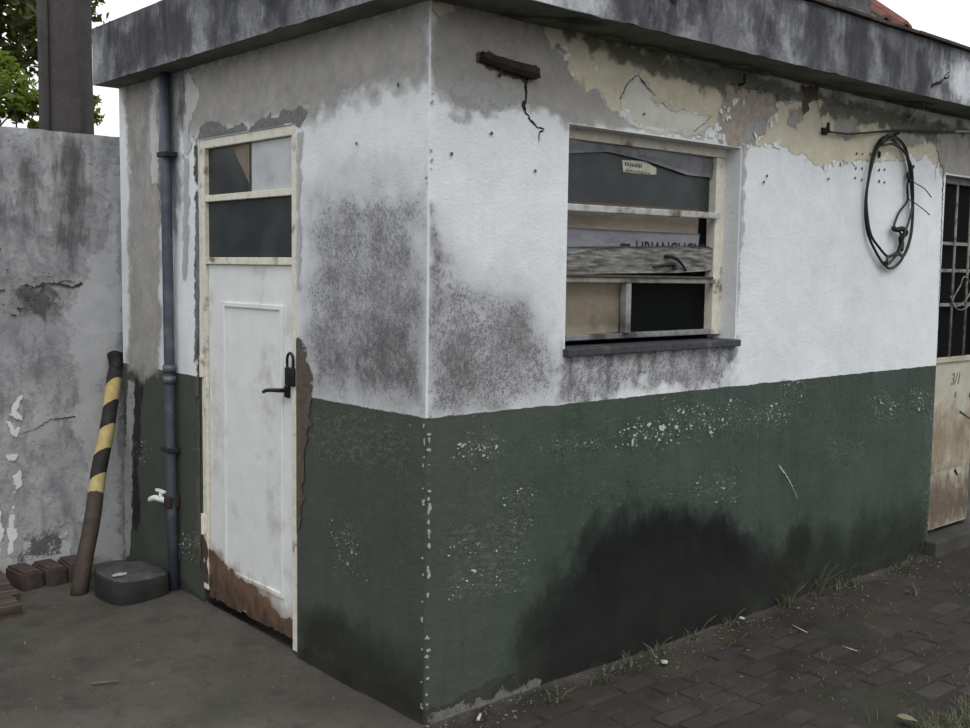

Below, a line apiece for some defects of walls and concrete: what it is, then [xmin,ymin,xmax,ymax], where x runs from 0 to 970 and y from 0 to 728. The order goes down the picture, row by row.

water stain [108,4,191,77]
crack [522,78,544,140]
peeling [543,26,943,171]
water stain [52,134,88,249]
water stain [125,0,970,416]
crack [0,280,83,307]
corrosion [928,475,969,529]
corrosion [203,538,293,639]